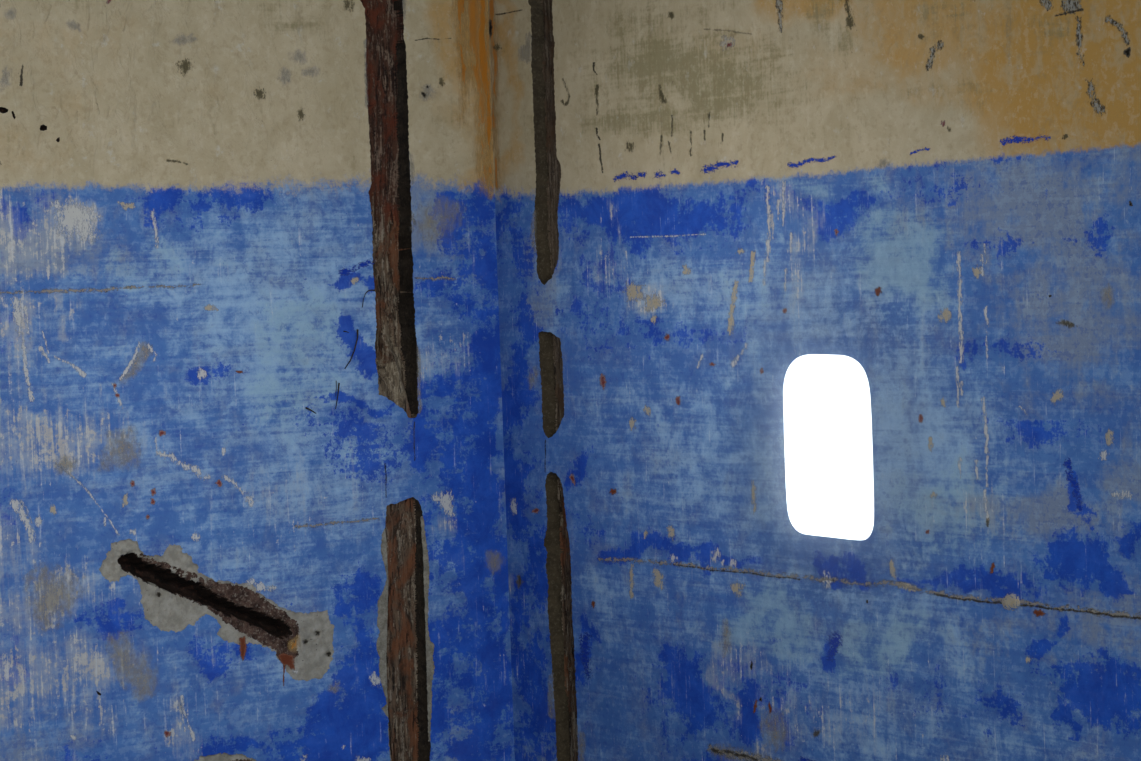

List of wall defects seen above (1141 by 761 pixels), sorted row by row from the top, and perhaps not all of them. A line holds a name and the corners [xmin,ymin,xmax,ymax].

spalling [99,529,336,692]
flaking render [369,529,392,761]
crack [598,557,1141,619]
spalling [194,752,256,761]